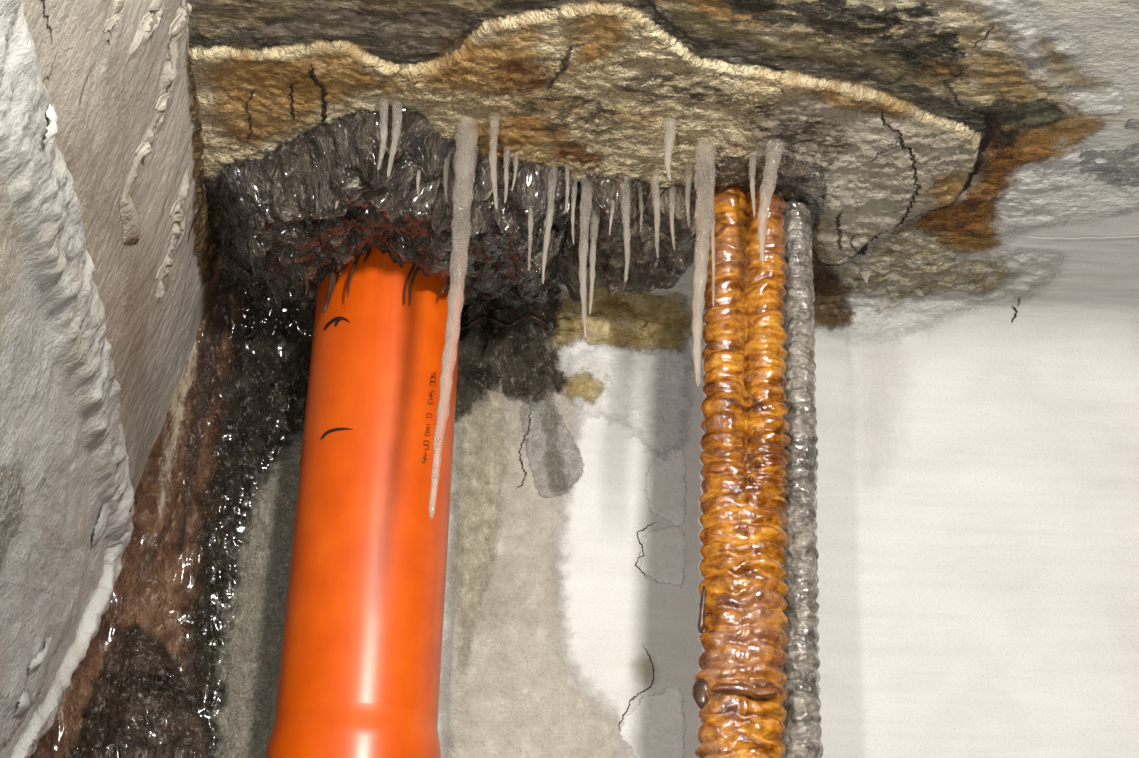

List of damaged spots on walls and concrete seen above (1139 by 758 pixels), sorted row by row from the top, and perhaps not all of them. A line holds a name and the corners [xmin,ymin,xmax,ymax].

crack [42,0,58,82]
peeling [156,194,188,290]
crack [244,90,255,143]
crack [288,65,328,124]
flaking render [189,3,1010,301]
corrosion [680,0,766,31]
crack [815,80,1028,266]
corrosion [892,112,1105,255]
leakage [455,153,704,493]
leakage [30,106,456,758]